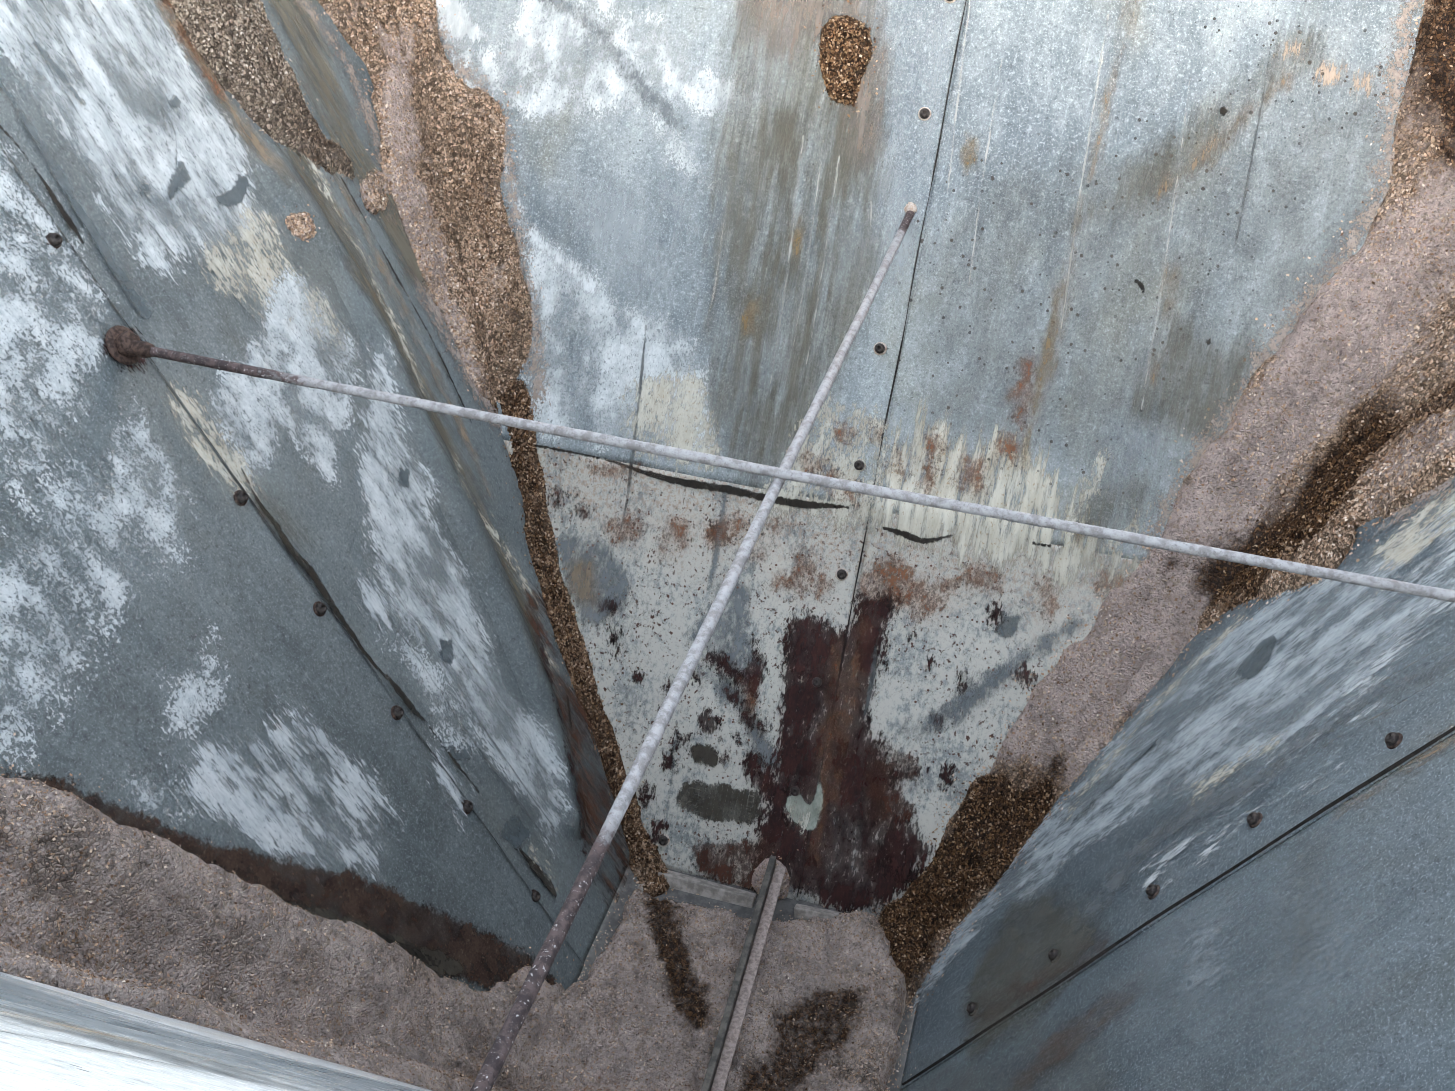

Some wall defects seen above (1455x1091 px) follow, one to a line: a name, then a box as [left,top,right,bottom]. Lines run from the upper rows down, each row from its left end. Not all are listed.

corrosion [156,0,630,906]
leakage [712,0,888,478]
corrosion [1007,357,1037,430]
corrosion [3,768,556,991]
corrosion [548,462,1124,915]